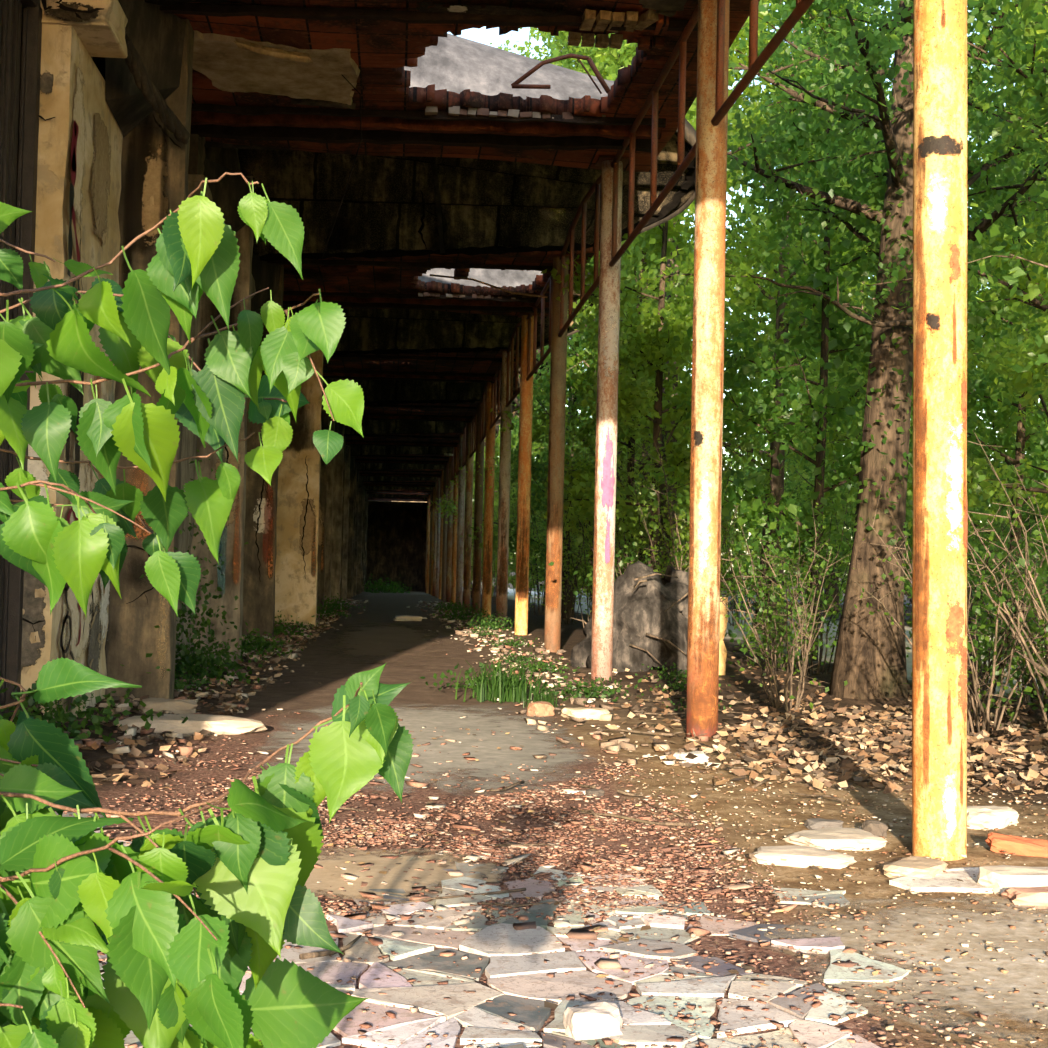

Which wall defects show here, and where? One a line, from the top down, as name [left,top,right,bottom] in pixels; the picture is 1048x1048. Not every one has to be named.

peeling [927,173,948,233]
corrosion [949,244,961,286]
corrosion [953,308,967,431]
corrosion [689,302,722,729]
corrosion [914,120,930,785]
peeling [946,418,963,555]
corrosion [945,595,967,805]